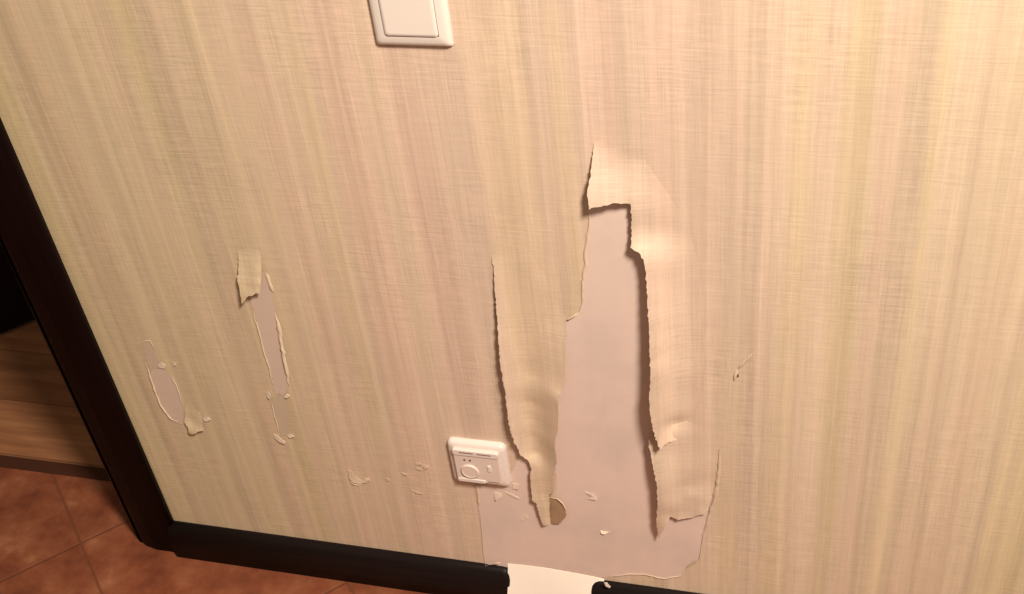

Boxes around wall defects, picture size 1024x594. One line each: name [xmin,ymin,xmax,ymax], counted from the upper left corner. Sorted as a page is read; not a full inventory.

flaking render [478,136,717,594]